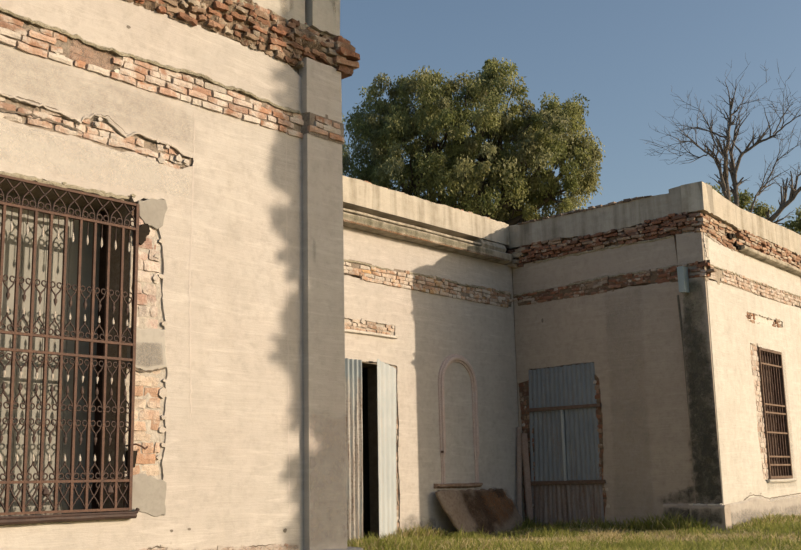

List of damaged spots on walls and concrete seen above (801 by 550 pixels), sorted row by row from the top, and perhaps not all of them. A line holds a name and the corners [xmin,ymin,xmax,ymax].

spalling [0,0,360,145]
spalling [0,92,193,169]
flaking render [133,215,164,329]
spalling [344,318,399,339]
flaking render [344,211,801,308]
spalling [746,312,782,328]
flaking render [125,368,168,476]
leakage [663,315,773,527]
flaking render [750,343,769,479]
crack [743,493,800,501]